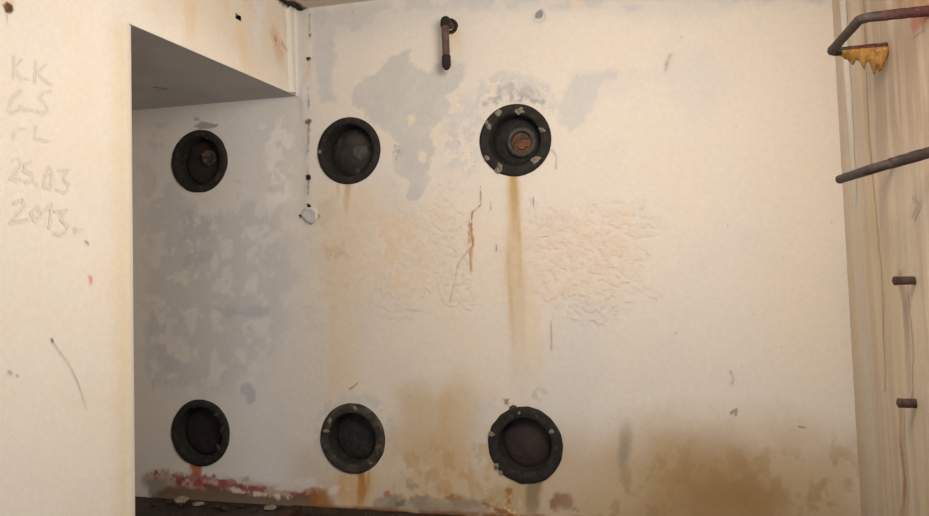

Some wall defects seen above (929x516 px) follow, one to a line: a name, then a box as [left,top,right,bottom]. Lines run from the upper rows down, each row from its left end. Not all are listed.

corrosion [0,0,17,28]
peeling [276,0,832,202]
peeling [132,108,341,407]
crack [448,186,482,302]
corrosion [308,172,861,516]
peeling [146,466,346,506]
peeling [361,478,493,512]
water stain [613,414,637,487]